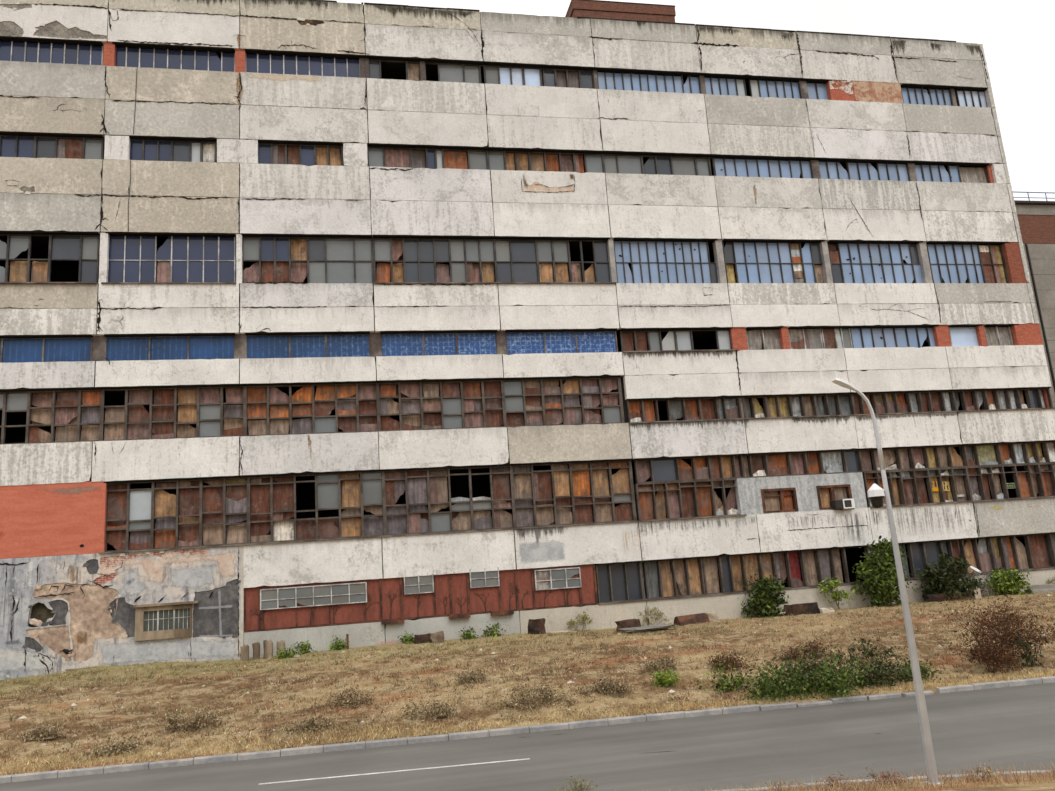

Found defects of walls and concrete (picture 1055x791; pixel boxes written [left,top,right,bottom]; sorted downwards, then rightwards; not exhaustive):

spalling [0,2,108,39]
crack [694,26,744,70]
peeling [830,80,853,94]
peeling [22,549,210,661]
peeling [193,579,241,638]